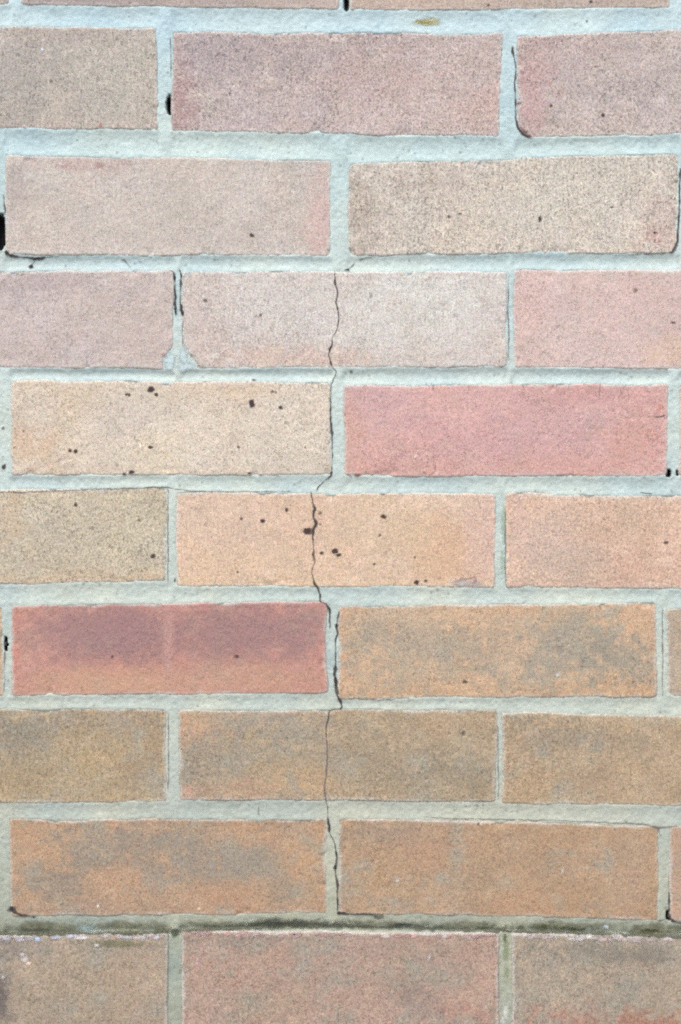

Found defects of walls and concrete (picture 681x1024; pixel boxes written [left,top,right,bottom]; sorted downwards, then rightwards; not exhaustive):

crack [0,257,378,916]
leakage [0,915,681,969]